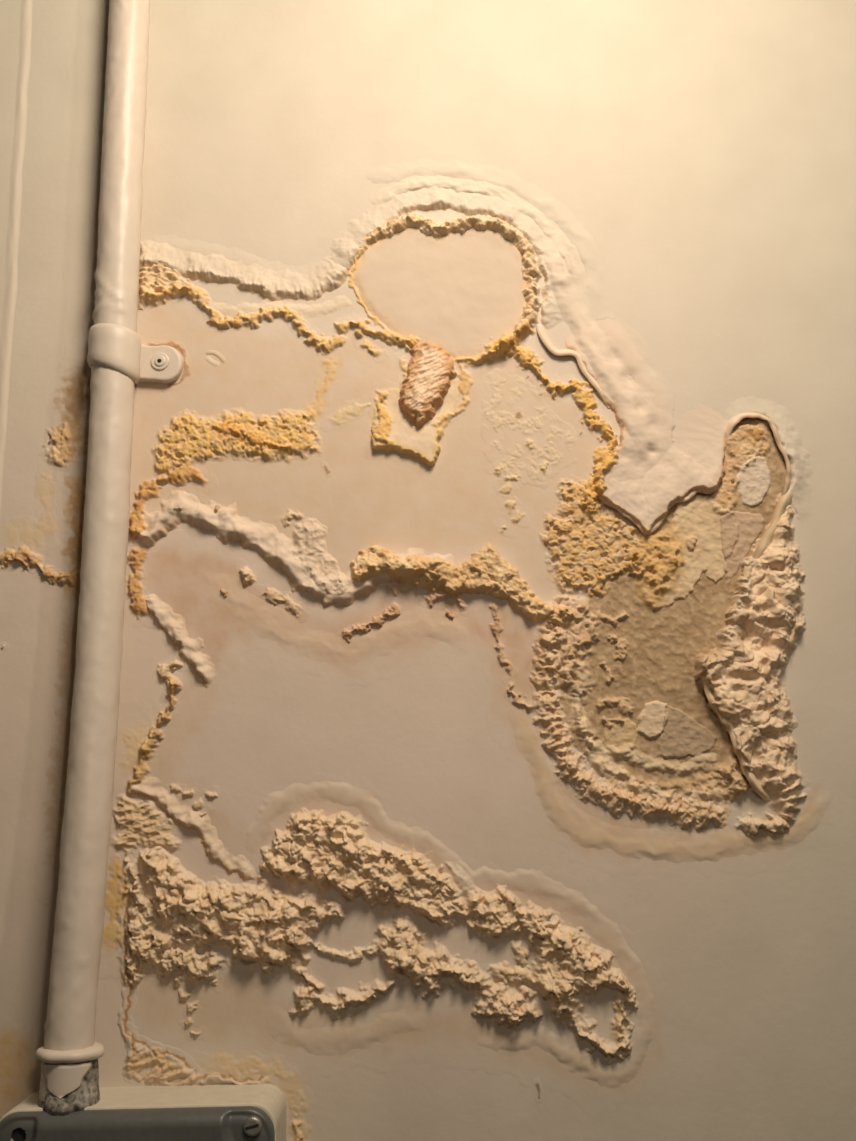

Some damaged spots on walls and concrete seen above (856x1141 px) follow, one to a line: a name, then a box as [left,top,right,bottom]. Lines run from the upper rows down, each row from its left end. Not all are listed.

water stain [0,336,91,906]
peeling [112,593,655,1088]
peeling [368,341,495,467]
water stain [115,299,845,1122]
peeling [485,396,834,863]